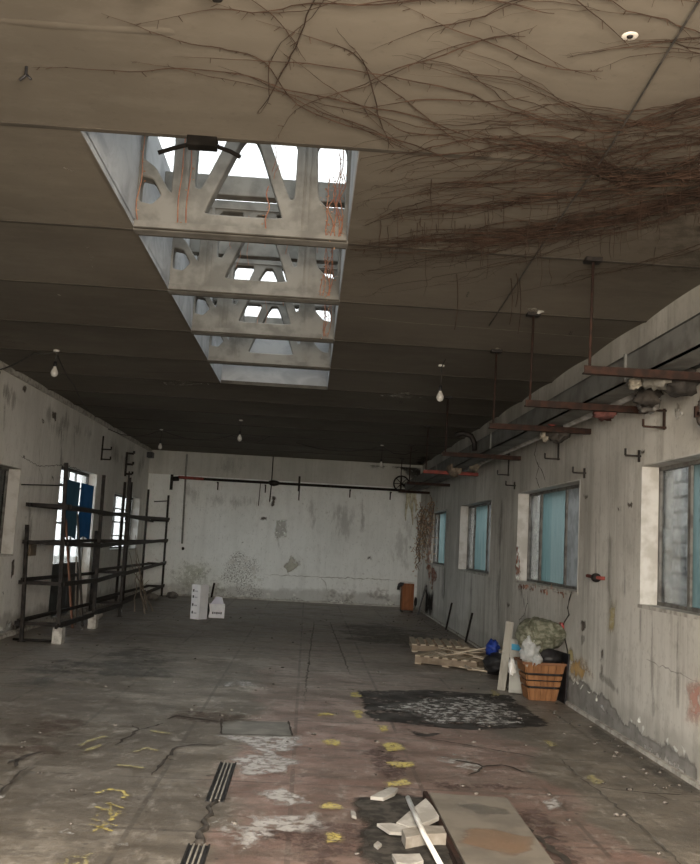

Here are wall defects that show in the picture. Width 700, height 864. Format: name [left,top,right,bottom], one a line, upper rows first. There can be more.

crack [0,752,40,793]